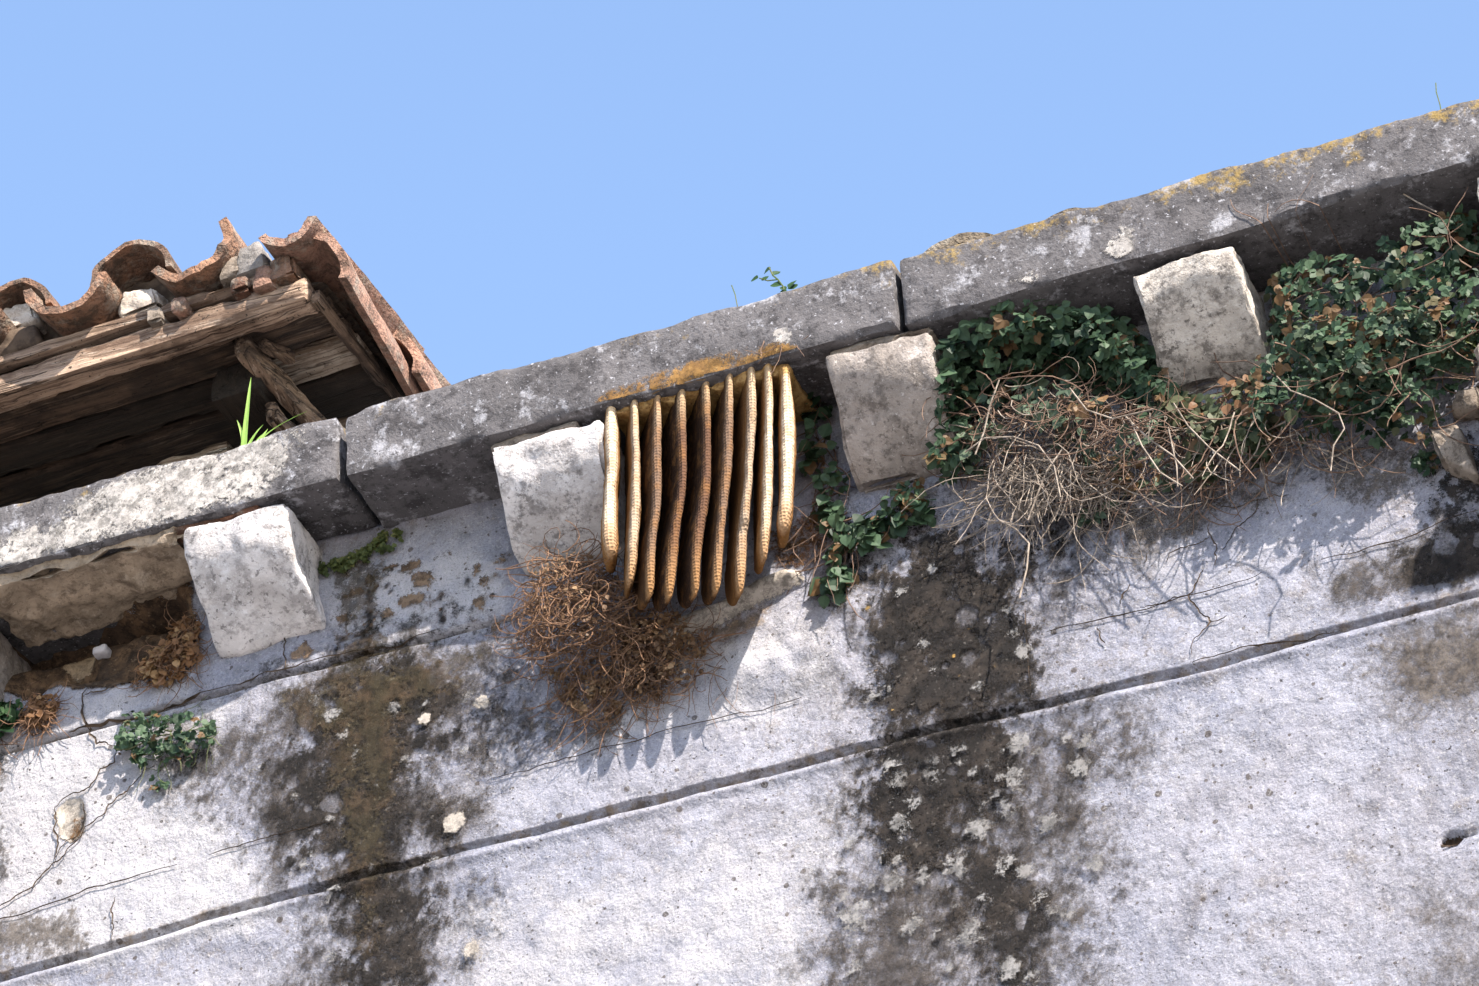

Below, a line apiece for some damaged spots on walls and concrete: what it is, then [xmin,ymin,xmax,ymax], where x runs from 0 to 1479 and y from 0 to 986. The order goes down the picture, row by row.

flaking render [4,582,198,701]
crack [0,630,434,945]
damp [156,601,646,986]
crack [493,697,801,778]
damp [791,470,1285,986]
crack [1025,494,1334,697]
damp [1271,421,1479,730]
crack [1321,510,1478,560]